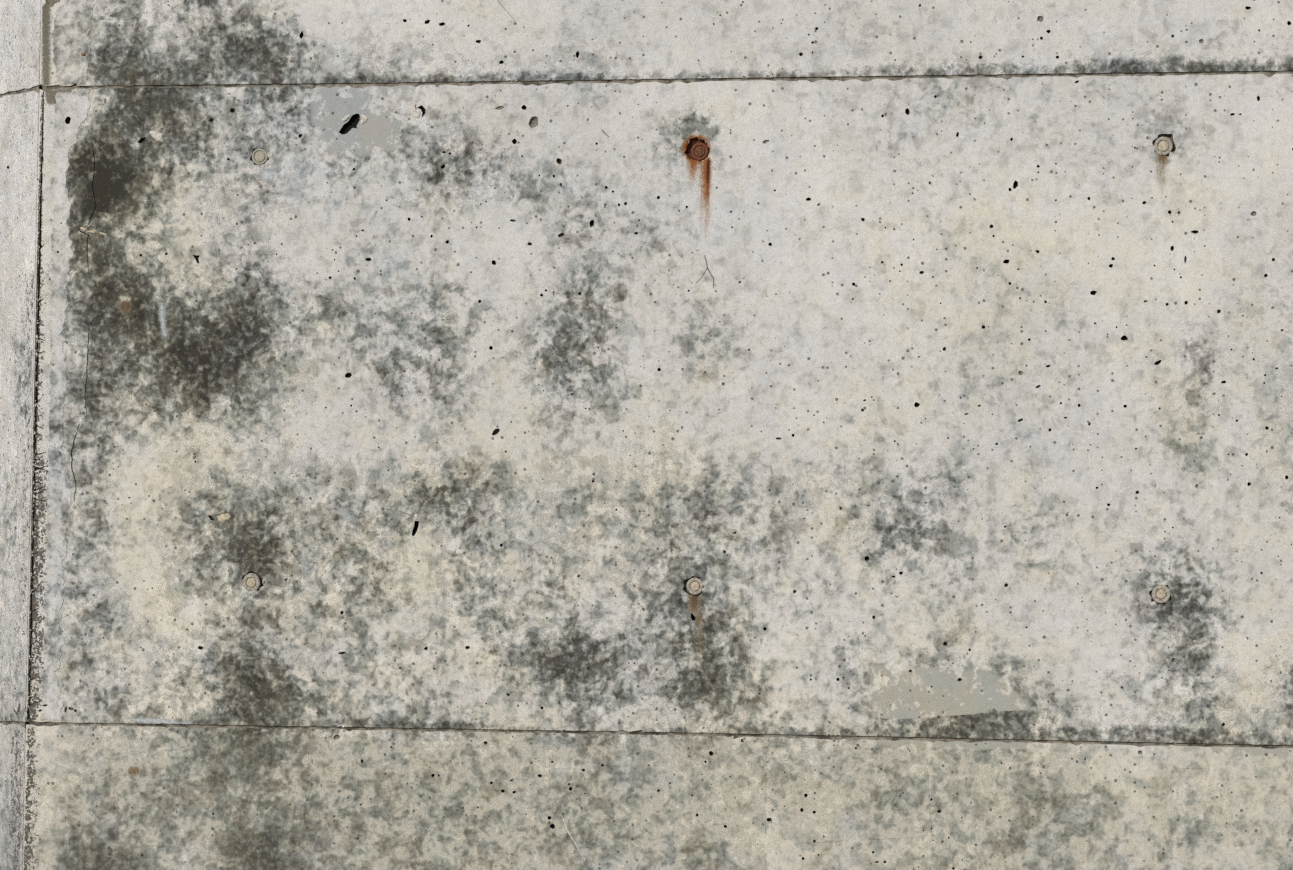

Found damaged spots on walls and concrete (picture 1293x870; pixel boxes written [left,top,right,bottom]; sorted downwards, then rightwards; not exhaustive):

leakage [87,0,1293,86]
leakage [664,102,722,160]
rust [683,135,711,204]
leakage [51,83,580,731]
leakage [505,252,613,407]
leakage [1170,322,1226,429]
leakage [1239,284,1293,515]
leakage [47,406,1293,870]